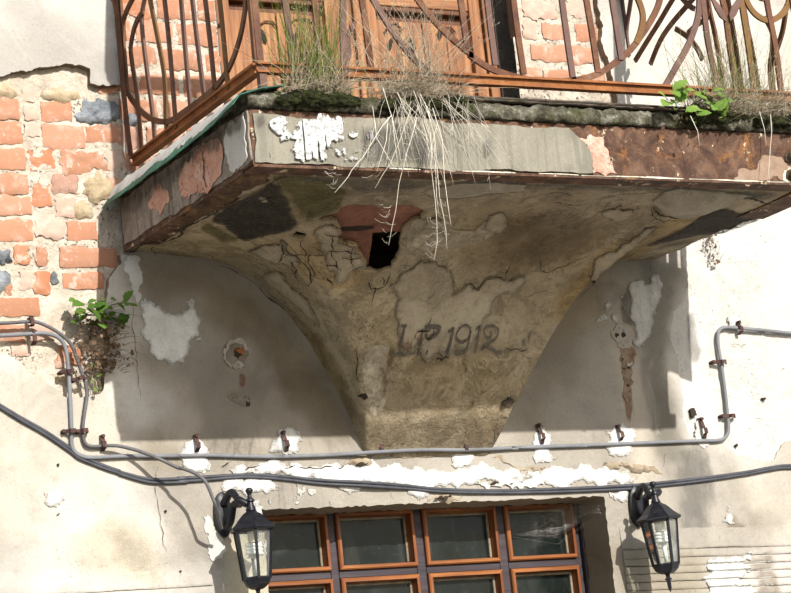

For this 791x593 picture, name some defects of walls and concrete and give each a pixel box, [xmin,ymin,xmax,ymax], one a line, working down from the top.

spalling [580,134,617,176]
spalling [0,0,224,398]
crack [134,176,289,310]
damp [202,177,344,242]
flaking render [314,224,366,285]
crack [250,233,595,303]
damp [648,210,758,247]
crack [415,292,435,340]
flaking render [595,274,663,402]
flaking render [670,207,791,461]
flaking render [221,455,663,515]
flaking render [702,552,757,593]